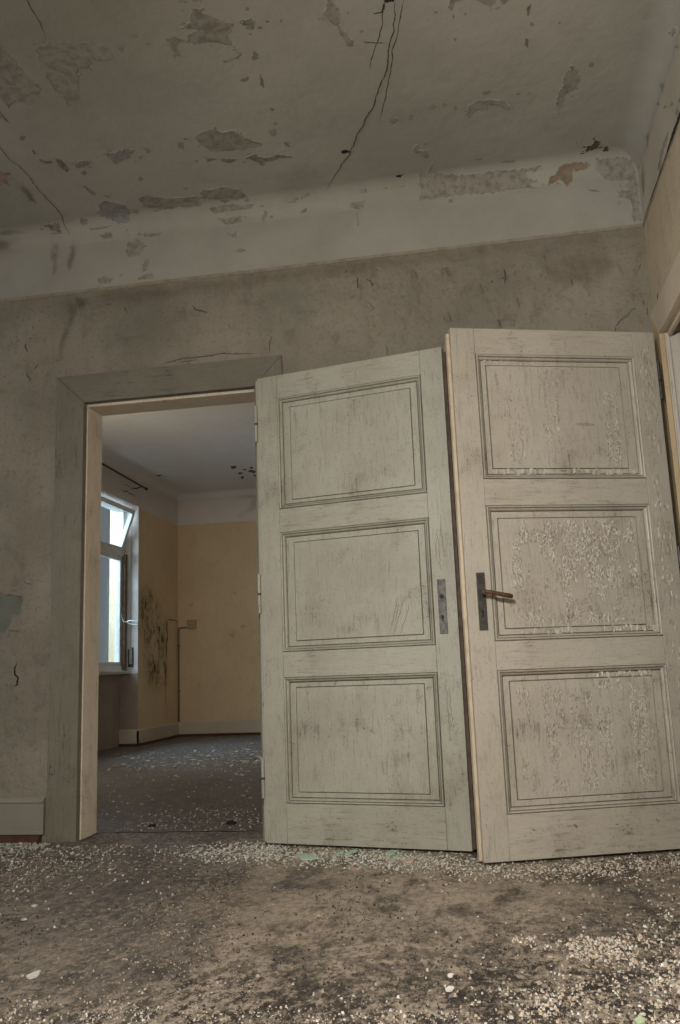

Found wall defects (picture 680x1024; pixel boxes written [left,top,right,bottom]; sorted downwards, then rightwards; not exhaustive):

peeling [166,0,282,63]
crack [0,112,72,234]
peeling [20,136,274,280]
peeling [177,108,293,167]
crack [327,0,404,191]
peeling [412,138,609,203]